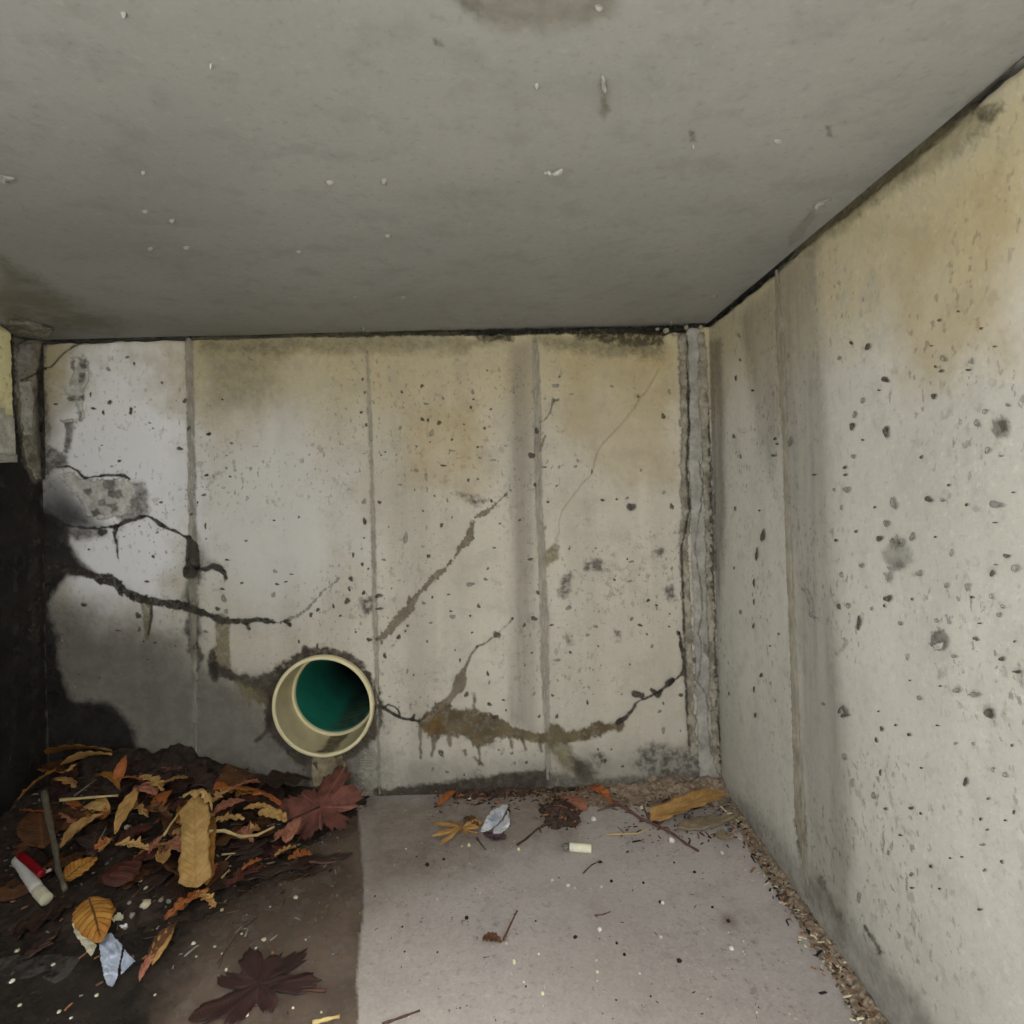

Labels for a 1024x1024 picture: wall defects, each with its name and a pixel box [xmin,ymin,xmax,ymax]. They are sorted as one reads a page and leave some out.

peeling [59,472,133,520]
damp [0,334,700,818]
crack [21,56,1024,764]